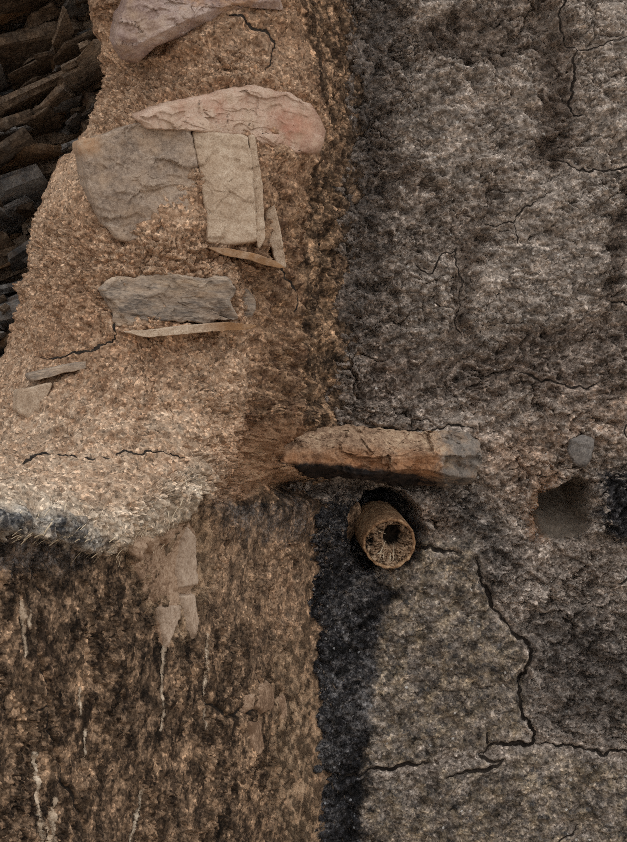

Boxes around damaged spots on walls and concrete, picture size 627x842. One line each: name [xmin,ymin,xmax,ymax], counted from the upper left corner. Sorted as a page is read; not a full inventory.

crack [229,14,276,71]
crack [558,0,627,117]
crack [548,160,627,173]
crack [415,247,464,340]
crack [357,424,473,432]
efflorescence [19,600,32,657]
damp [159,646,167,731]
damp [202,633,210,727]
crack [415,545,627,779]
efflorescence [31,752,59,842]
efflorescence [129,790,144,842]
crack [341,762,428,781]